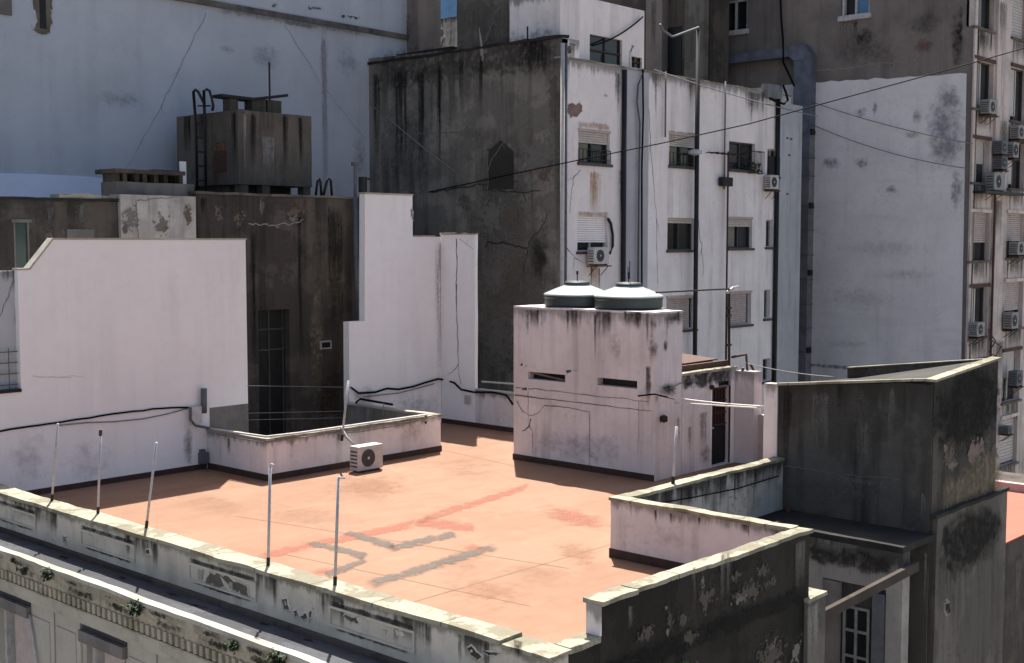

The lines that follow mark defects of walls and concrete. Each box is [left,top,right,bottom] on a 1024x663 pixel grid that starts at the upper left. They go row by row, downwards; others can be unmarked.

crack [127,13,206,167]
water stain [374,31,548,156]
peeling [514,63,586,189]
crack [249,219,304,228]
crack [431,132,579,385]
water stain [594,312,611,334]
crack [515,379,697,465]
peeling [942,435,998,476]
water stain [934,369,1018,599]
flaking render [197,569,250,596]
peeling [638,564,776,645]
peeling [754,630,802,663]